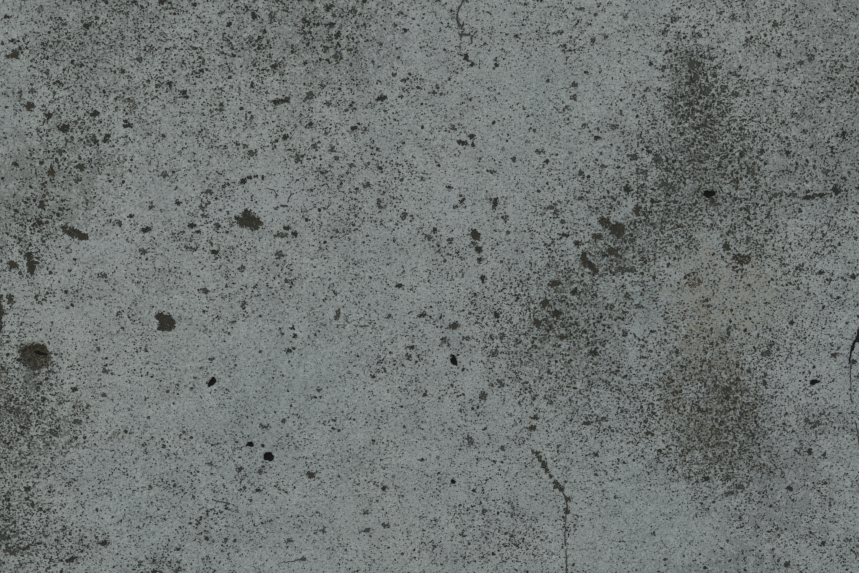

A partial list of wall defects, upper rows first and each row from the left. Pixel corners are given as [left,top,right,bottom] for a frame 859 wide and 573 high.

crack [848,329,859,442]